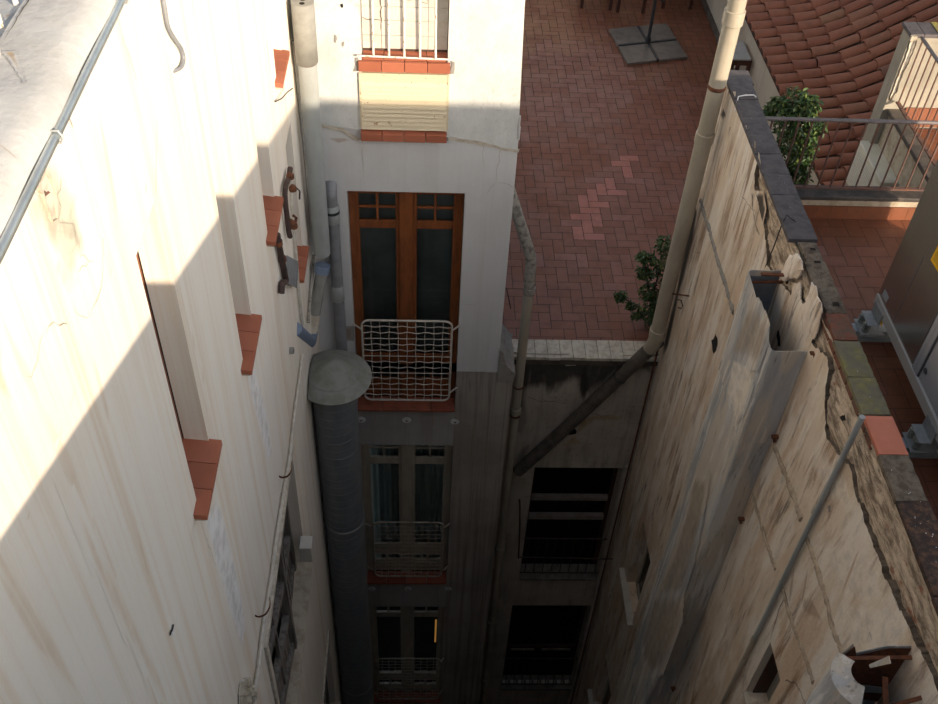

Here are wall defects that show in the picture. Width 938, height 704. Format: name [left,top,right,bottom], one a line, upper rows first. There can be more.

leakage [24,147,89,279]
spalling [754,165,773,270]
crack [28,190,103,378]
leakage [509,352,633,437]
spalling [801,282,938,691]